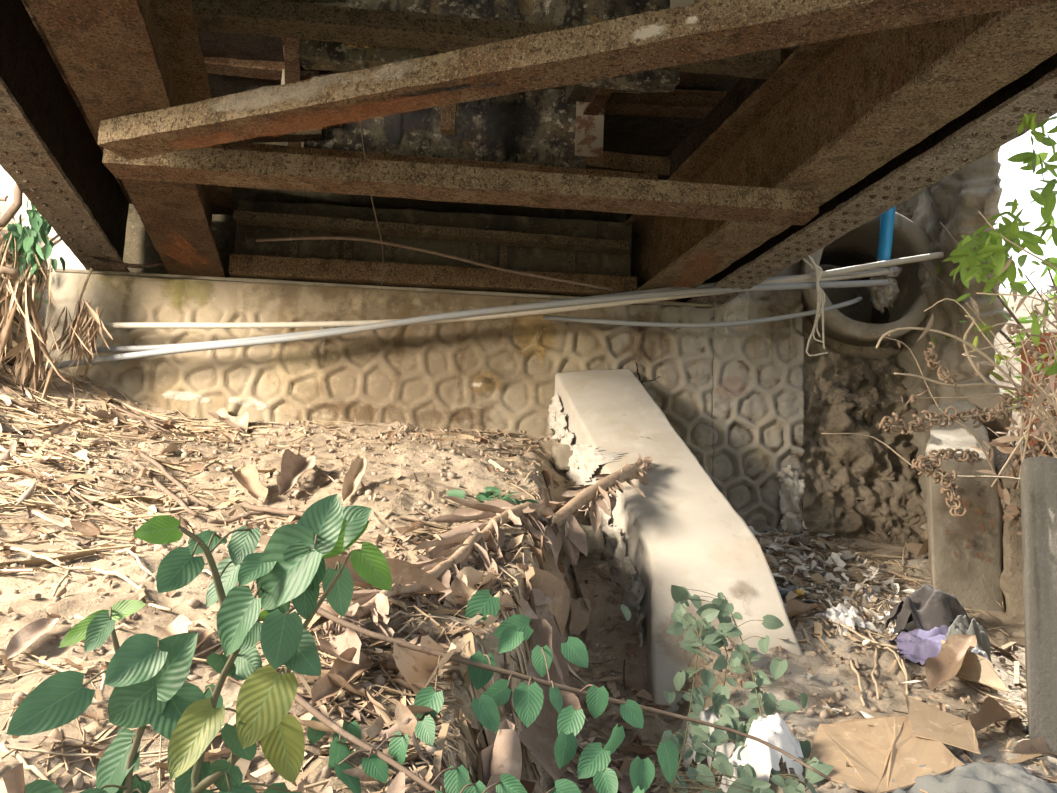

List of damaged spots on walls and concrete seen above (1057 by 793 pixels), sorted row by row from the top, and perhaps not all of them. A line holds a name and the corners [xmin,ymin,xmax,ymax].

water stain [381,83,540,161]
flaking render [548,393,624,491]
flaking render [582,501,645,648]